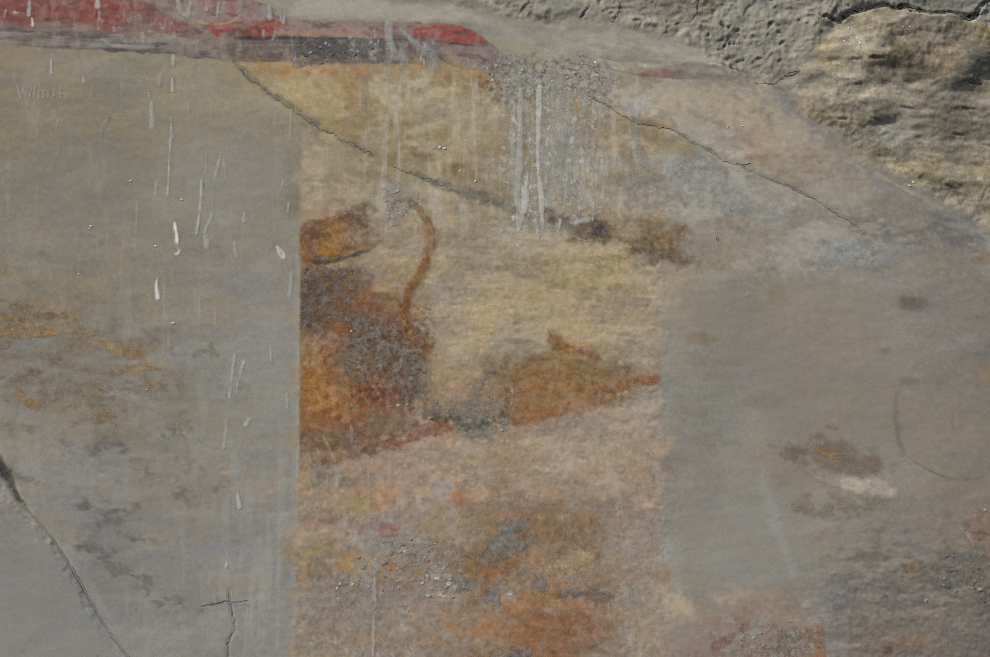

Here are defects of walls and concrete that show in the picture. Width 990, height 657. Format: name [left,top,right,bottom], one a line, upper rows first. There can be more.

crack [820,0,990,23]
crack [233,60,371,152]
crack [399,169,488,201]
water stain [490,54,614,243]
crack [592,96,861,231]
water stain [630,219,687,264]
rust [300,199,457,463]
rust [483,333,659,423]
crack [0,460,129,657]